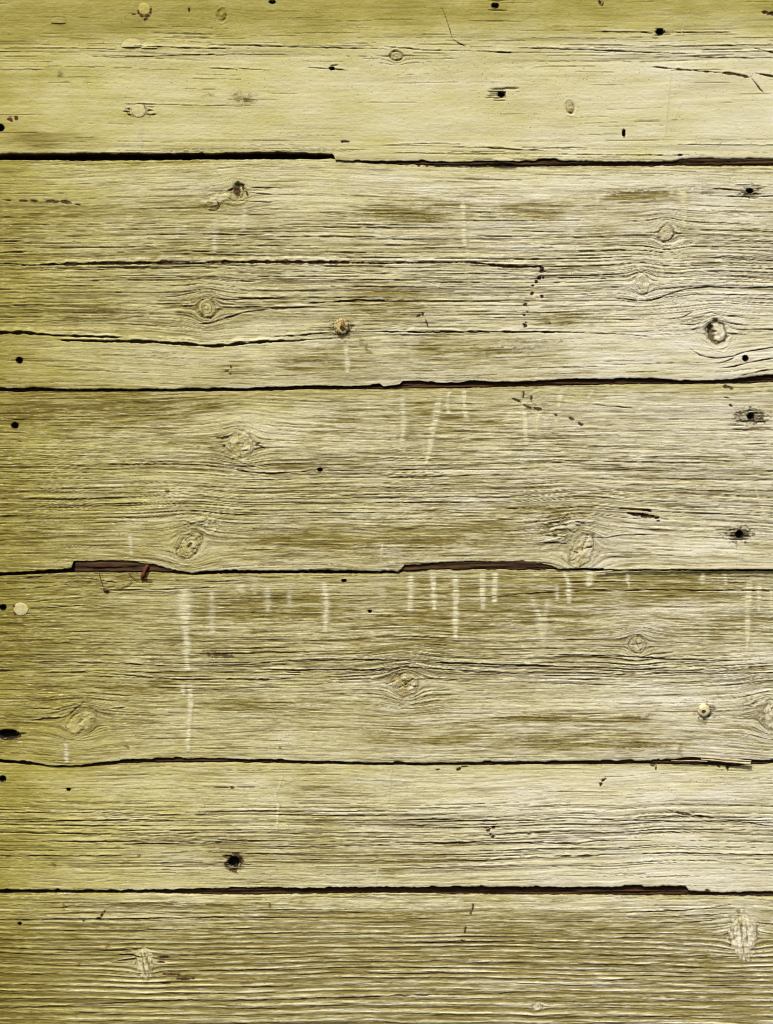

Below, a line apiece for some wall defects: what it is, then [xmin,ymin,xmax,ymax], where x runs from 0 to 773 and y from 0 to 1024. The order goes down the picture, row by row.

crack [0,297,385,348]
crack [378,328,606,336]
water stain [177,588,192,671]
water stain [322,582,330,632]
water stain [452,575,460,640]
water stain [479,572,498,609]
water stain [531,572,572,644]
water stain [744,581,773,655]
water stain [180,684,194,752]